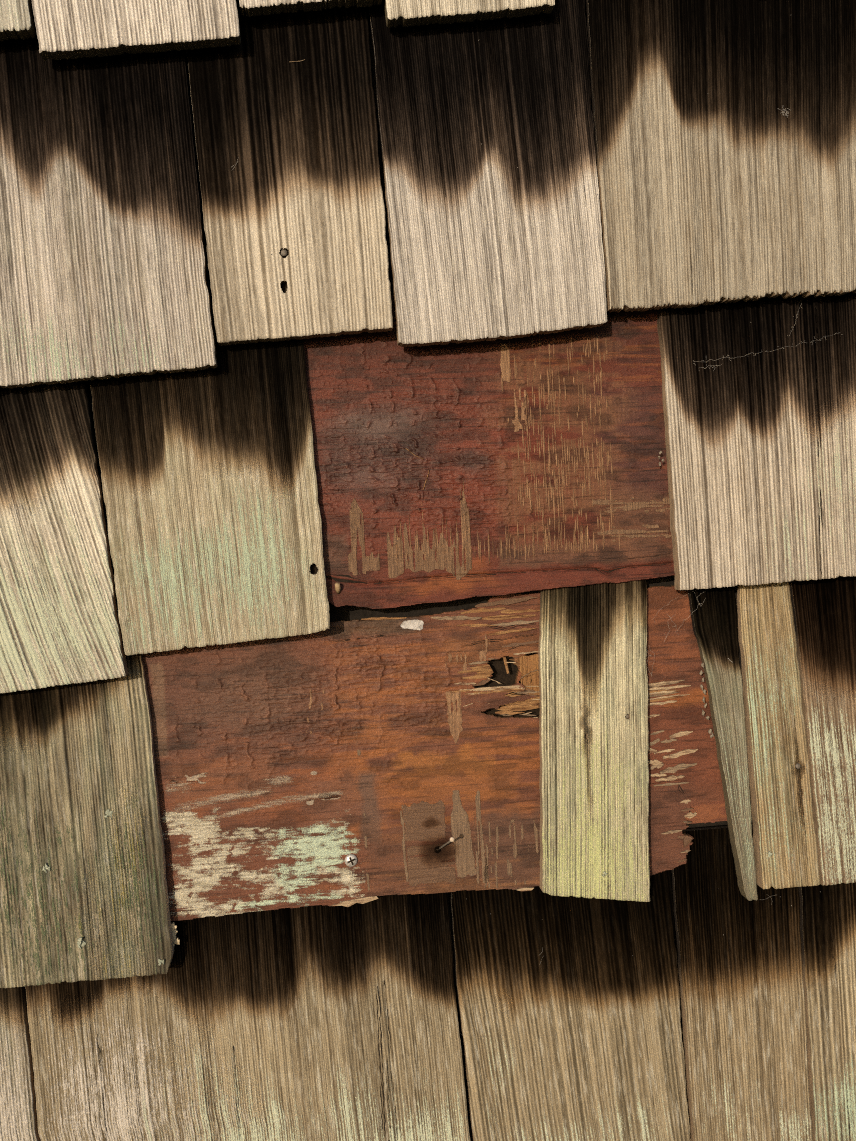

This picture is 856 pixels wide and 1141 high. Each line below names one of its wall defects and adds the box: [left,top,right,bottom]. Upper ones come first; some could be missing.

peeling [165,773,206,792]
peeling [162,776,370,918]